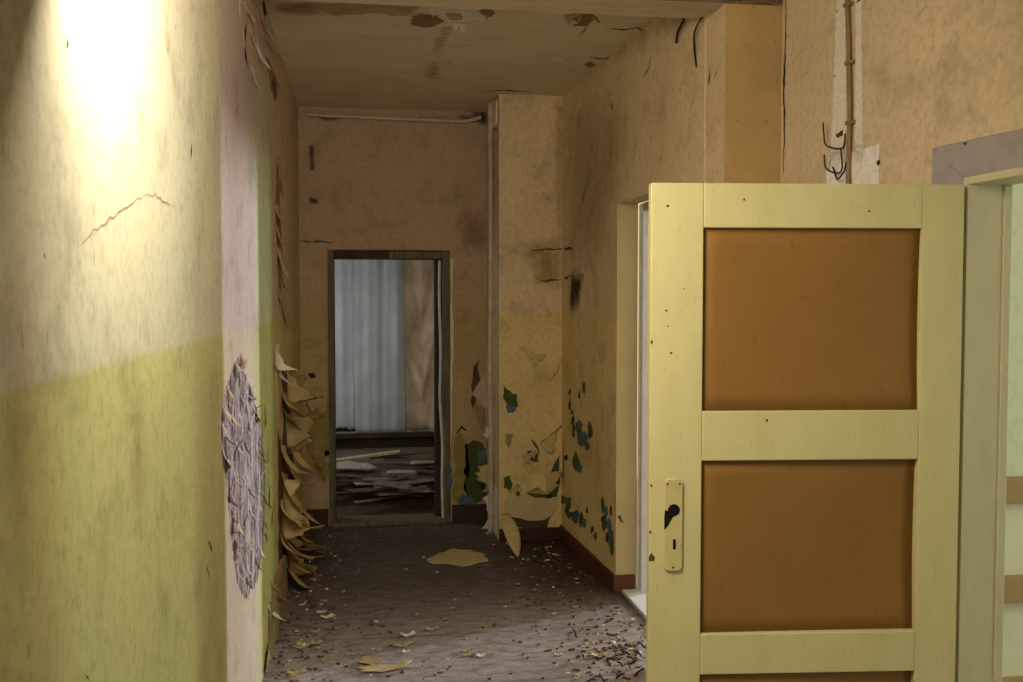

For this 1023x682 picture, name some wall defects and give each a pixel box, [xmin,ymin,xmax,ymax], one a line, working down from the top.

peeling [240,0,284,101]
peeling [410,6,495,34]
peeling [564,13,600,36]
crack [81,193,173,245]
peeling [447,259,624,556]
flaking render [220,344,329,673]